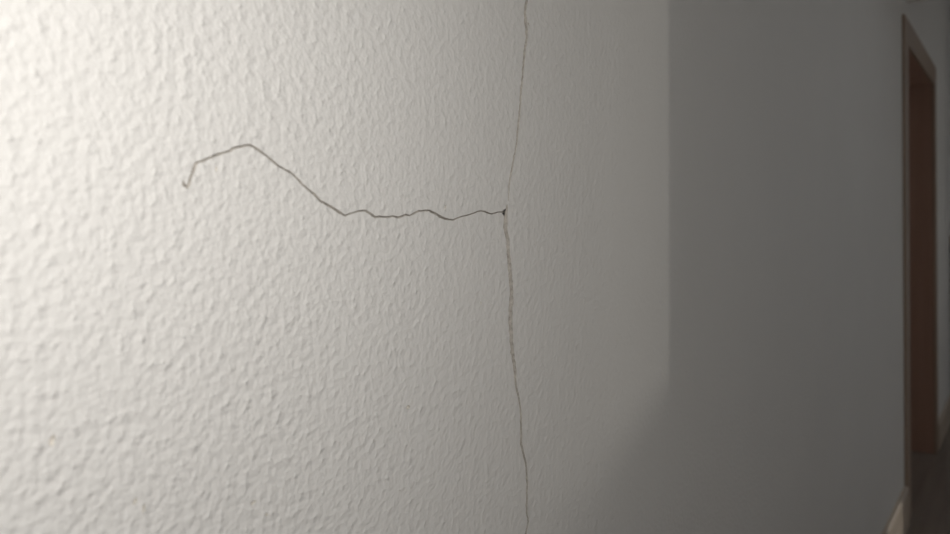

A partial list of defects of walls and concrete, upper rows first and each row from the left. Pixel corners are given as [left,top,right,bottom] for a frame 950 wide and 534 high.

crack [182,0,529,534]